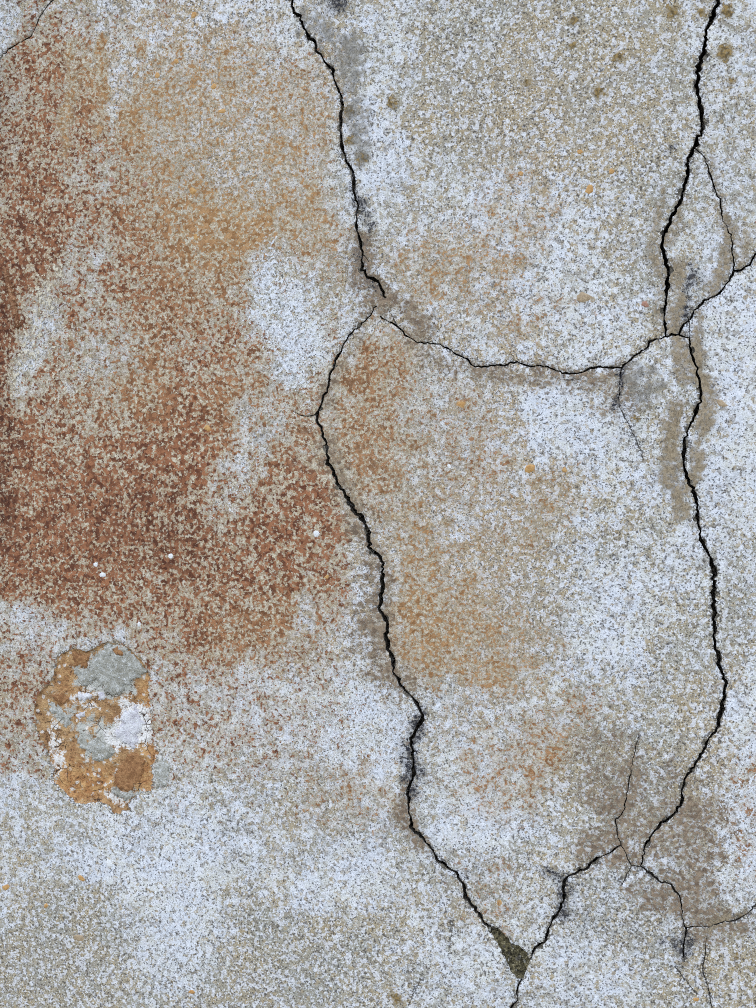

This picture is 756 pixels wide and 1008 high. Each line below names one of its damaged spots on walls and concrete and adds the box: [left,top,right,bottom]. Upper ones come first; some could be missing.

crack [1,0,54,58]
rust [0,0,620,839]
crack [289,0,756,1008]
spalling [34,641,171,814]
rust [444,846,519,940]